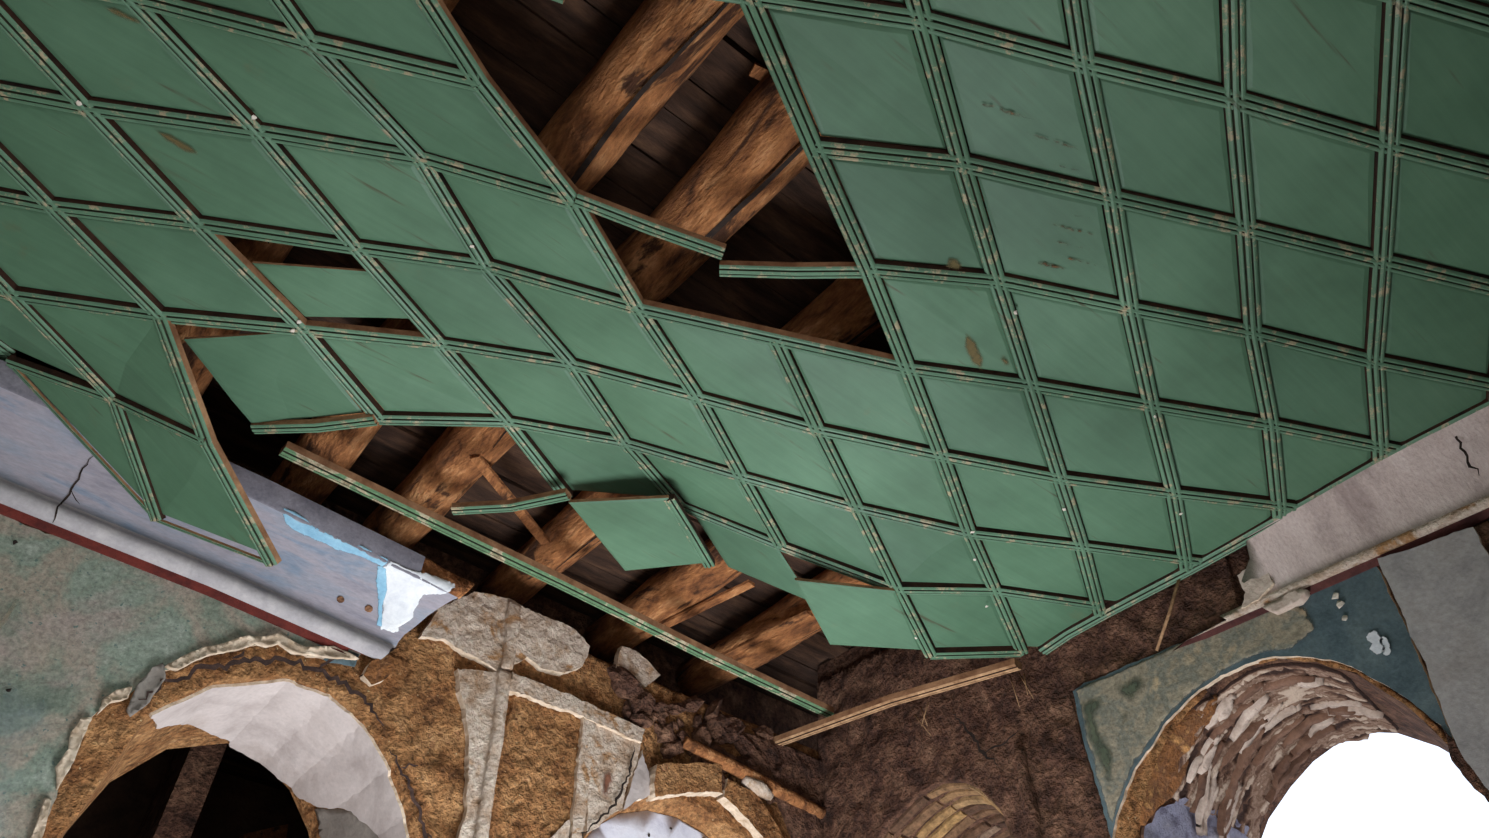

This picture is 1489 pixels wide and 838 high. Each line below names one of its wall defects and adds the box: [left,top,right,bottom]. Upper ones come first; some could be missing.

crack [1455,436,1479,474]
crack [53,456,93,522]
flaking render [30,508,1489,838]